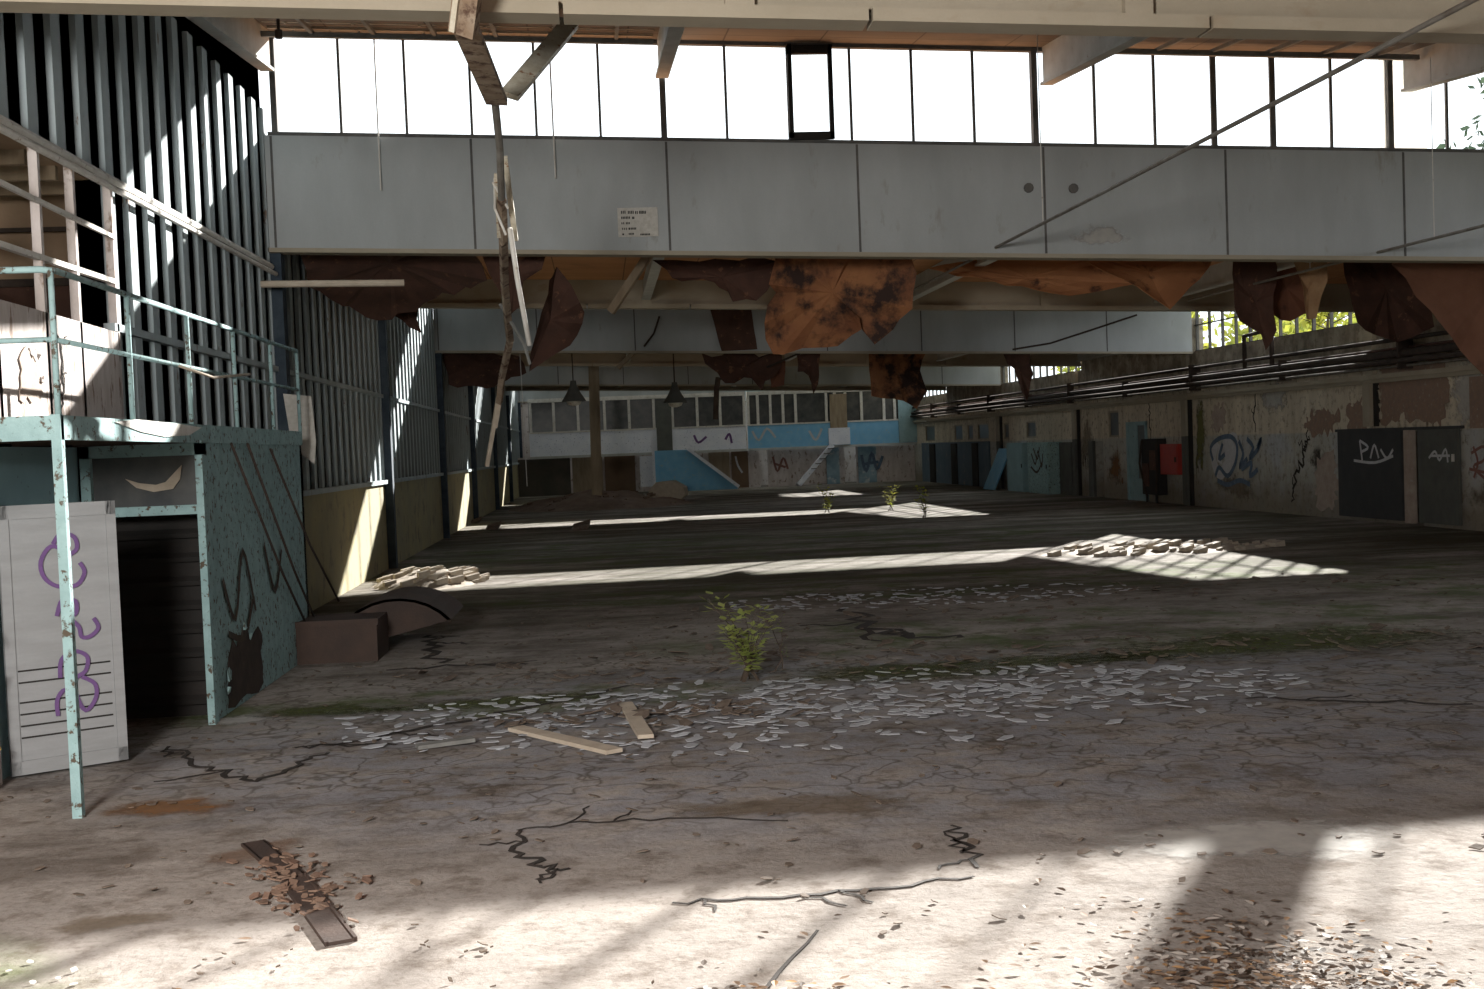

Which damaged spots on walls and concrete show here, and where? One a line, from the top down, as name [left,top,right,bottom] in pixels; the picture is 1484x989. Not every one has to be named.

crack [479,806,788,883]